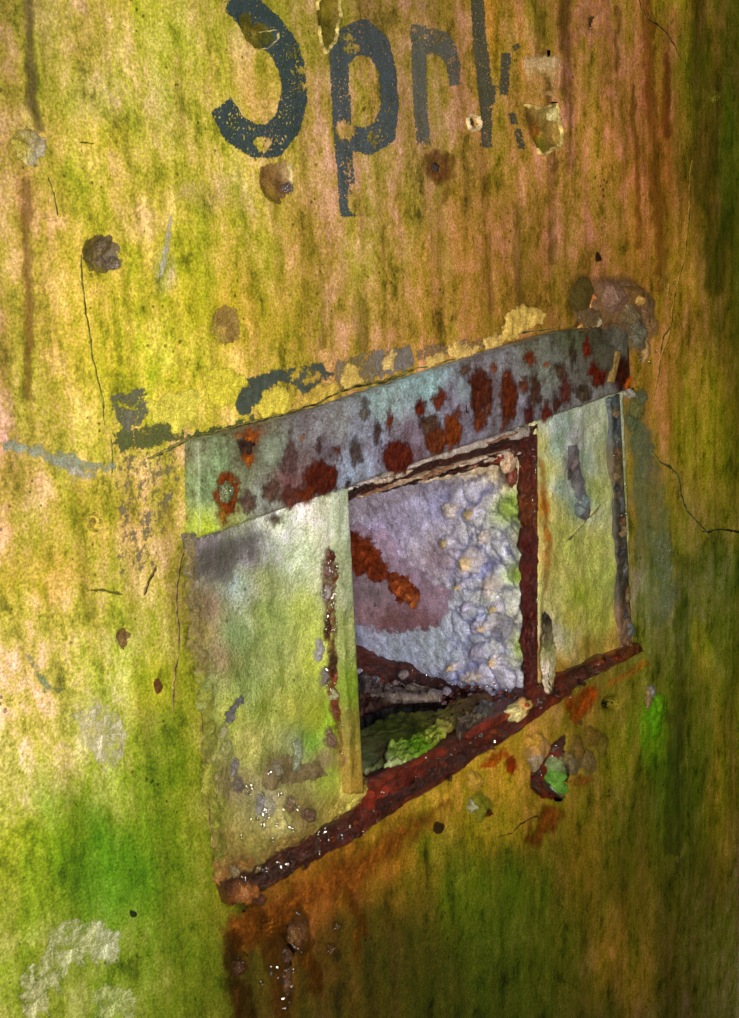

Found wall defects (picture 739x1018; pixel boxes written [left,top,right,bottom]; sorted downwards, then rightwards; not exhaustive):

water stain [27,0,40,130]
spalling [523,54,564,156]
water stain [547,0,570,104]
water stain [633,26,670,143]
crack [638,0,681,59]
corrosion [415,337,632,456]
corrosion [212,435,363,528]
peeling [110,337,485,575]
crack [652,451,739,540]
corrosion [350,530,420,609]
corrosion [314,548,346,769]
spalling [530,735,569,799]